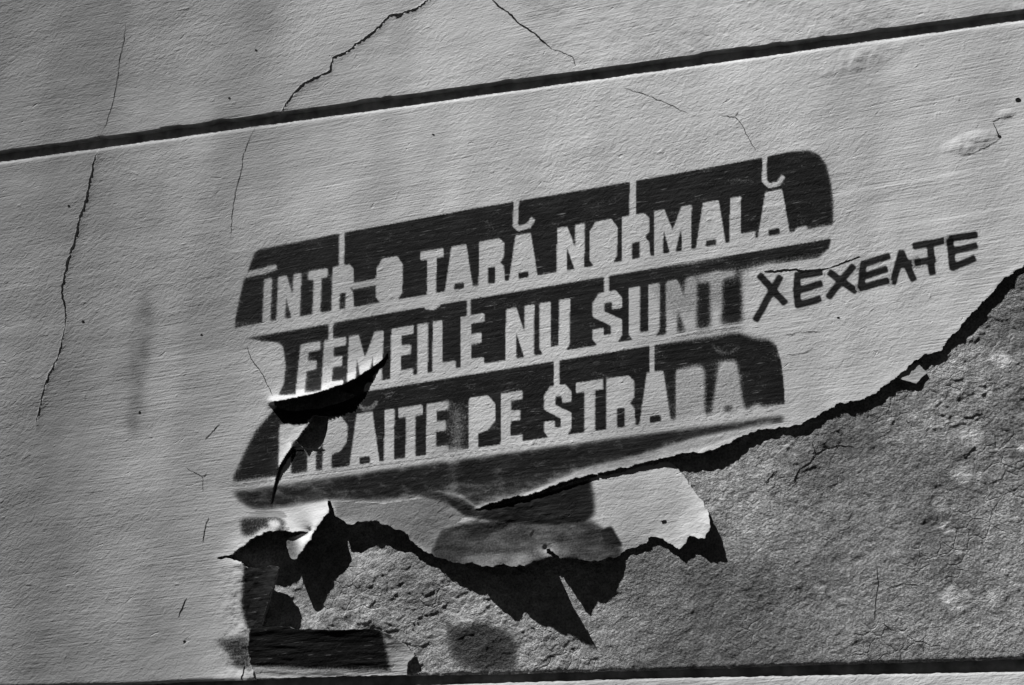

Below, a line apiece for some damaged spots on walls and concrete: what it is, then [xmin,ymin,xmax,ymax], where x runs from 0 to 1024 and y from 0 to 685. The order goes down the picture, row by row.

crack [280,0,428,113]
crack [493,0,576,66]
crack [36,154,97,421]
spalling [219,266,1024,677]